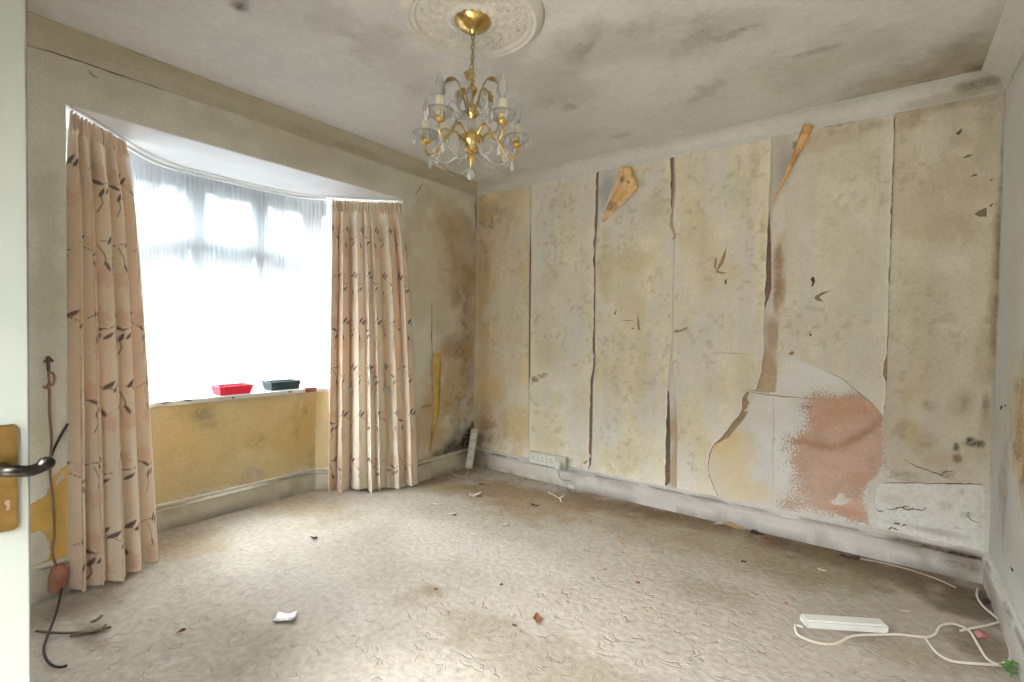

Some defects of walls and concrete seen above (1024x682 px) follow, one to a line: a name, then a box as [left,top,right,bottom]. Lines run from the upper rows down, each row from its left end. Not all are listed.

peeling [602,166,638,222]
peeling [772,124,813,203]
peeling [430,352,441,452]
leakage [444,422,481,453]
flaking render [775,386,884,527]
spalling [30,530,51,566]